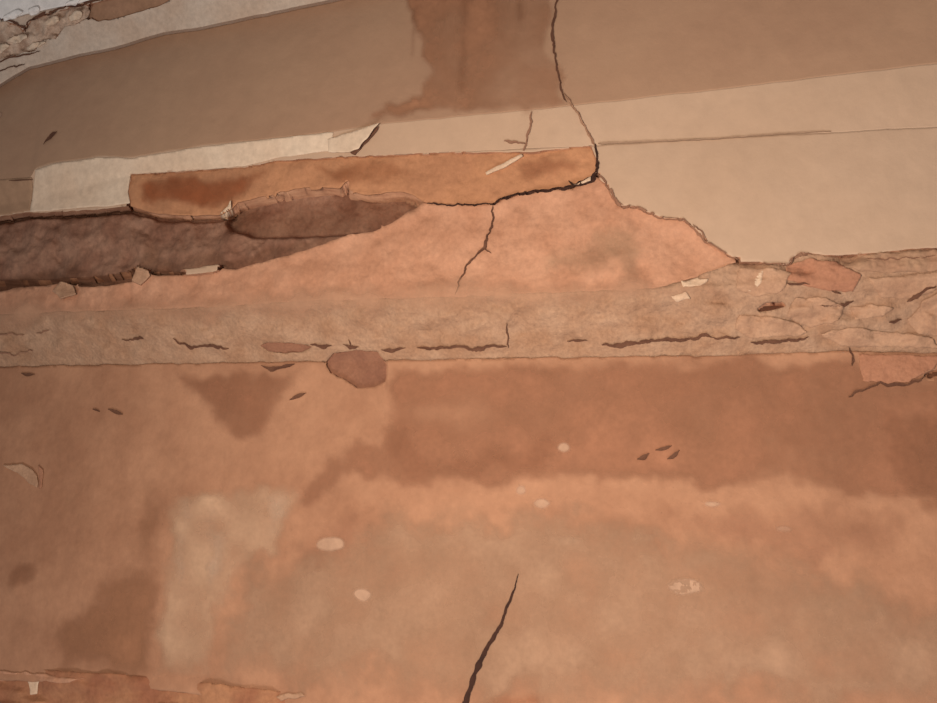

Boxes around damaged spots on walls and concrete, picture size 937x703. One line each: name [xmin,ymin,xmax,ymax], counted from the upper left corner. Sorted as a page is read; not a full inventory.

flaking render [0,0,168,60]
water stain [382,0,508,115]
crack [427,0,831,288]
flaking render [0,123,937,367]
crack [822,290,854,307]
crack [867,254,935,262]
water stain [309,357,937,497]
flaking render [0,350,937,703]
crack [462,576,518,703]